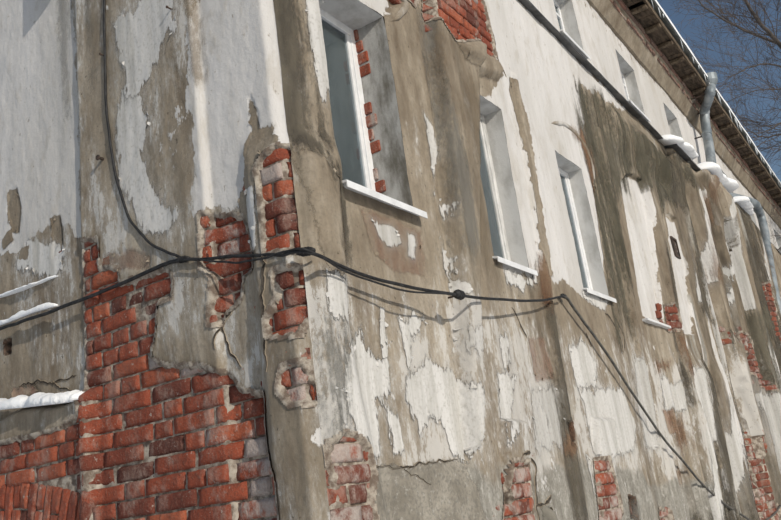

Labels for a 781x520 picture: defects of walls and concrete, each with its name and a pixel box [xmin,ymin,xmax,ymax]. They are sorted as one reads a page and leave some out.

crack [19,375,76,390]
peeling [113,0,179,235]
flaking render [0,235,318,520]
crack [213,304,242,367]
flaking render [196,101,309,341]
crack [259,247,268,372]
crack [376,458,458,485]
leakage [551,81,715,351]
leakage [673,331,696,407]
leakage [693,354,755,520]
peeling [693,188,781,520]
leakage [732,192,781,394]